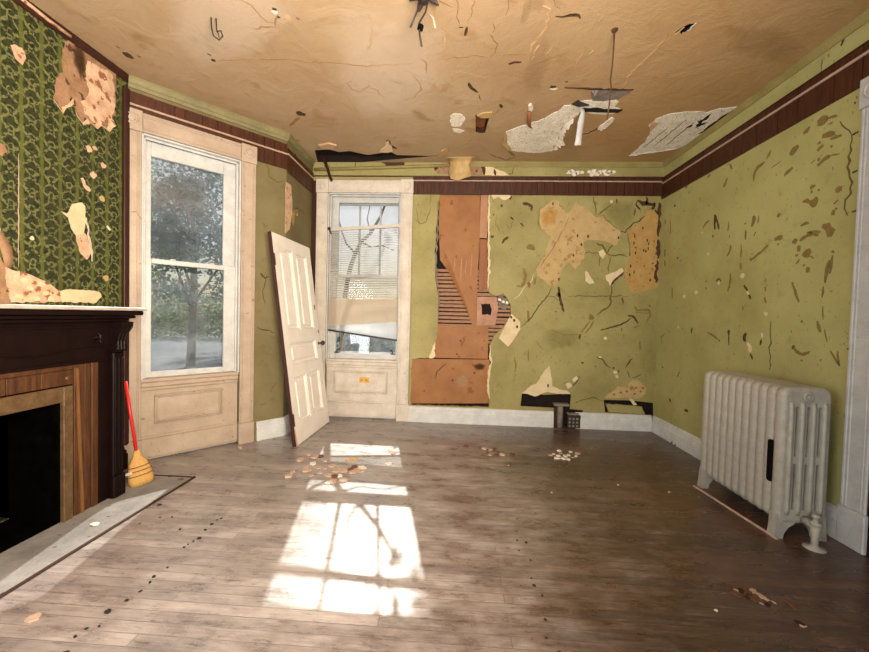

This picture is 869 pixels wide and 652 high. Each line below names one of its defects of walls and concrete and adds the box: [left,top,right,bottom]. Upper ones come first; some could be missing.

crack [241,0,277,29]
crack [440,0,581,60]
crack [214,58,412,67]
flaking render [506,103,581,153]
flaking render [629,107,736,156]
crack [753,161,765,181]
crack [839,121,853,216]
flaking render [5,267,101,304]
flaking render [477,195,530,400]
crack [514,200,656,327]
peeling [510,200,671,340]
peeling [523,357,580,396]